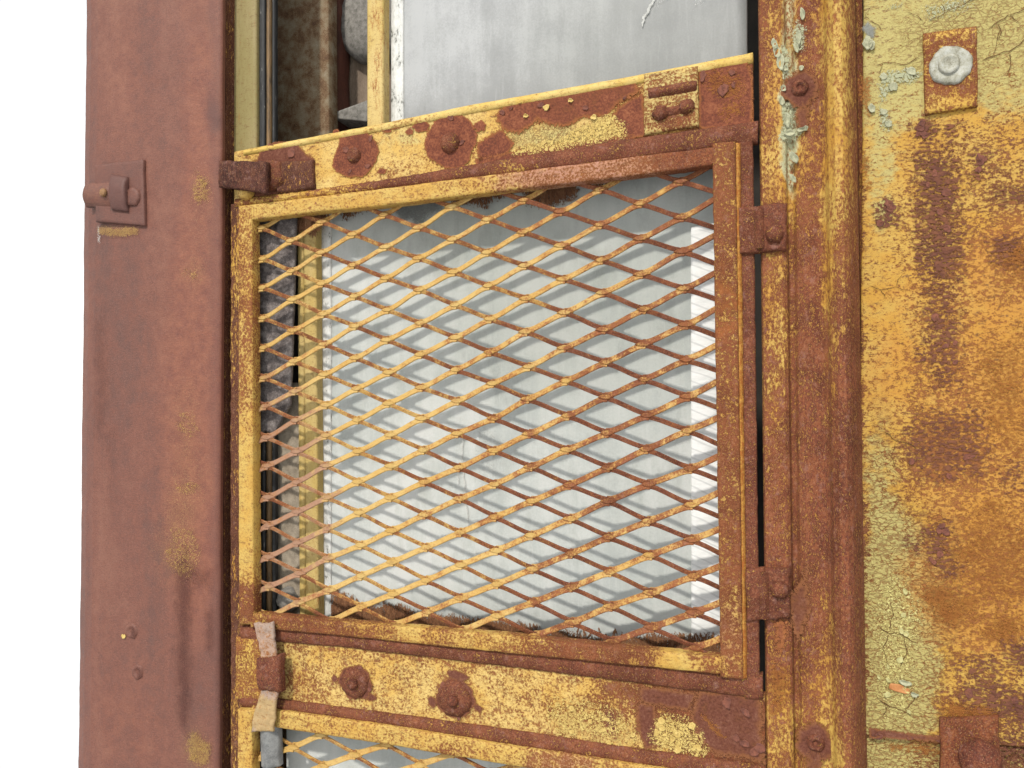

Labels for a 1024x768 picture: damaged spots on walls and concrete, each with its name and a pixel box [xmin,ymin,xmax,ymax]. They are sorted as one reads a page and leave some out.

peeling [862,22,875,50]
peeling [771,7,808,183]
rust [257,141,314,162]
rust [332,83,644,178]
peeling [512,113,628,156]
rust [869,114,1024,766]
rust [331,589,720,652]
peeling [870,575,925,726]
crack [881,603,916,666]
peeling [543,696,709,758]
rust [635,684,767,765]
crack [881,697,915,717]